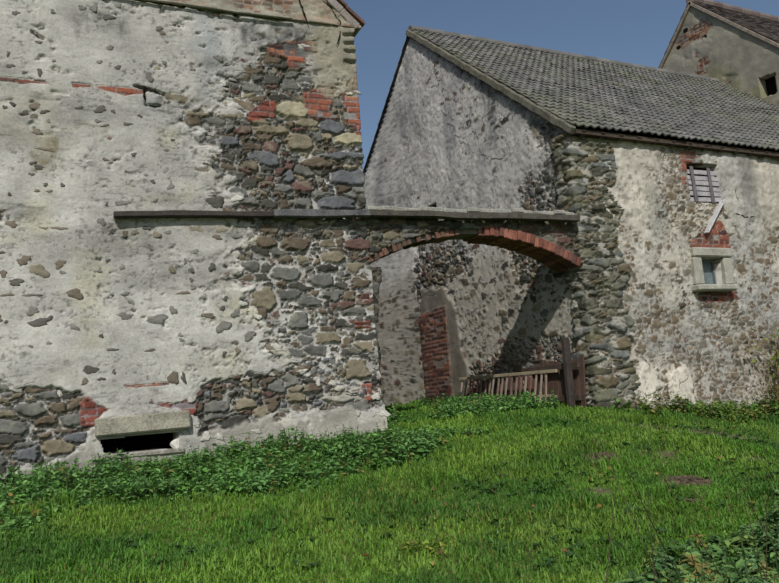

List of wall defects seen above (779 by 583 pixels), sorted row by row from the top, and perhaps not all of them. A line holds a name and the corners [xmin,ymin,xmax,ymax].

flaking render [676,16,707,50]
spalling [94,105,116,127]
spalling [520,125,566,211]
spalling [146,40,391,441]
spalling [416,242,475,298]
spalling [512,251,541,284]
spalling [66,288,84,300]
spalling [110,292,136,320]
spalling [81,365,116,385]
flaking render [125,371,187,389]
spalling [0,378,104,474]